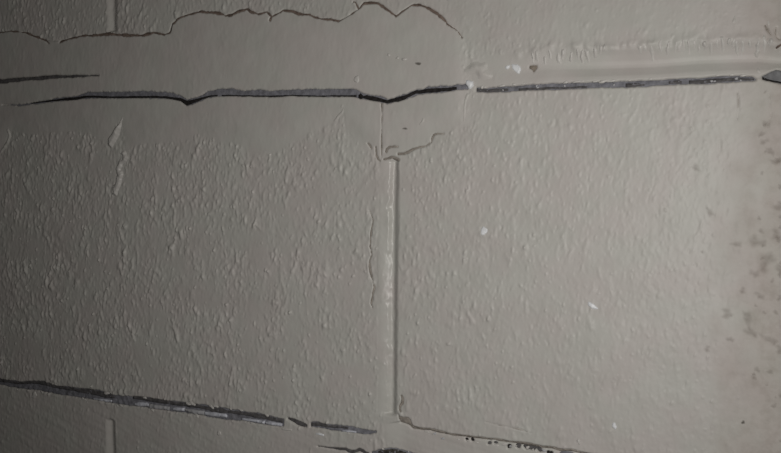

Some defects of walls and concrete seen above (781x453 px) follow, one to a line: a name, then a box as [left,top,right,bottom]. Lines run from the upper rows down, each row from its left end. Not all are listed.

crack [0,73,756,161]
crack [0,378,412,453]
crack [399,395,587,453]